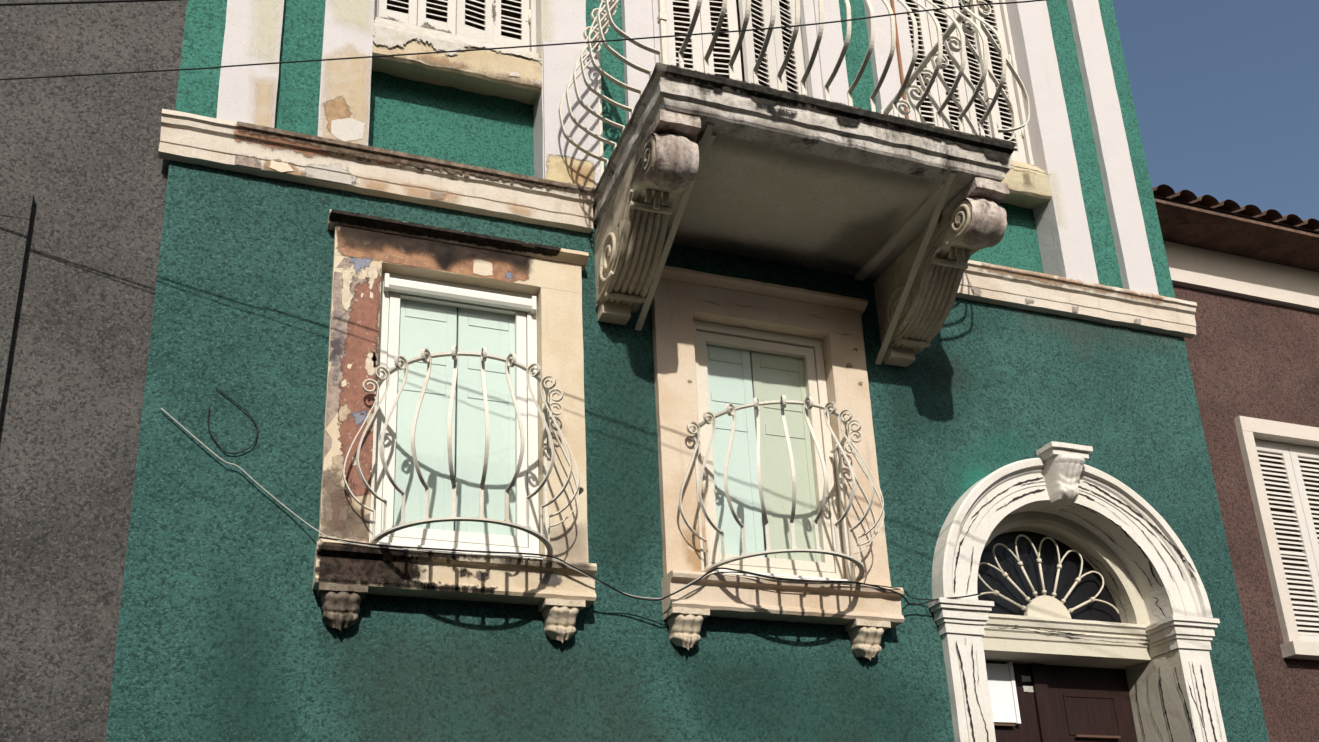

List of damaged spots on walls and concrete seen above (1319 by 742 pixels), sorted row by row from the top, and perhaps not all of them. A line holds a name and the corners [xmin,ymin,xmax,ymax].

peeling [373,17,542,68]
peeling [234,47,422,185]
leakage [713,79,723,94]
leakage [751,88,798,133]
leakage [835,111,862,126]
leakage [977,134,1014,164]
peeling [320,227,531,542]
leakage [315,541,588,593]
crack [954,477,1222,742]